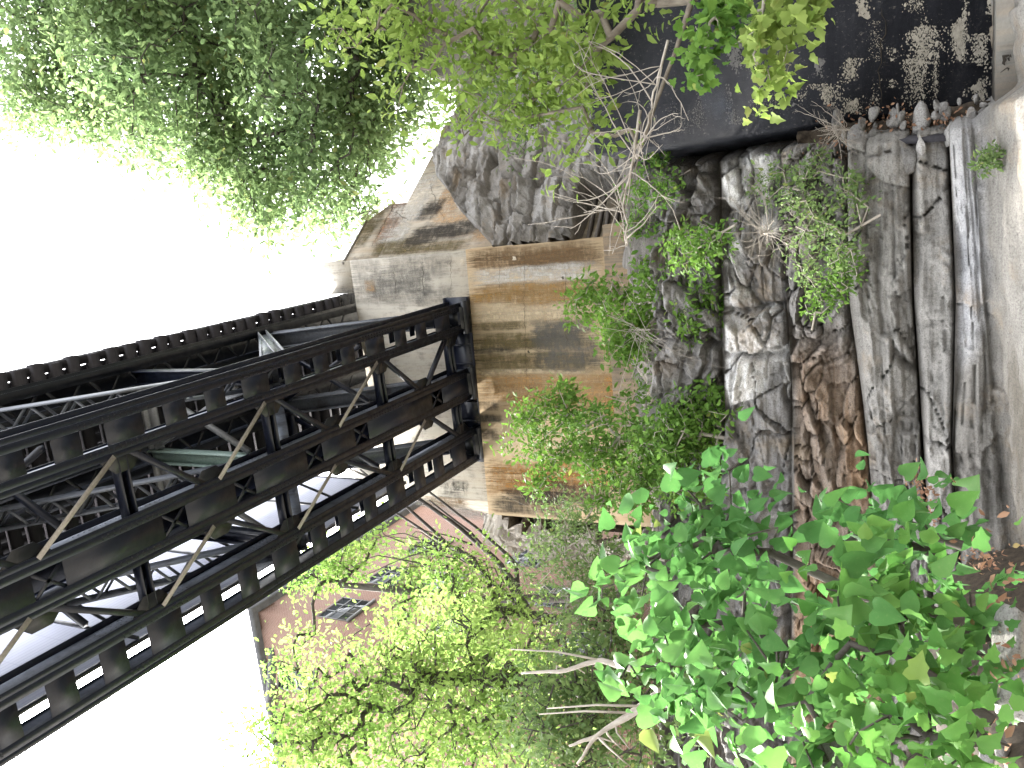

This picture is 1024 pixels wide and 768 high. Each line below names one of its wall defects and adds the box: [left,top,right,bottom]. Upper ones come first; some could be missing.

peeling [724,0,992,125]
leakage [350,175,475,255]
leakage [471,242,595,286]
leakage [472,302,596,377]
leakage [475,402,501,439]